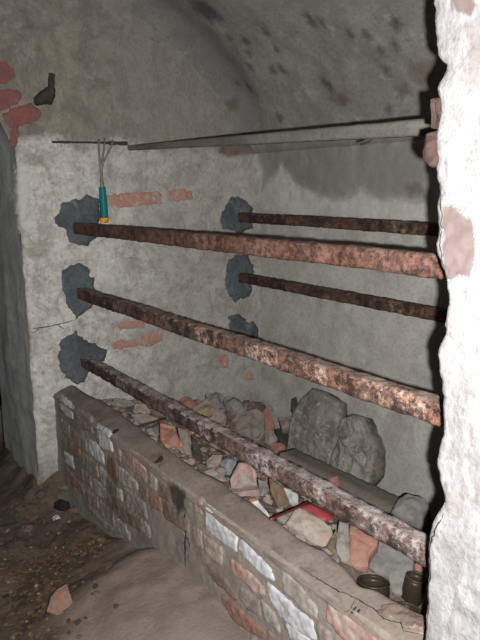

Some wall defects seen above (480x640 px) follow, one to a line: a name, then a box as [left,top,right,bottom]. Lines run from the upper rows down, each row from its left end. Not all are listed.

corrosion [73,222,447,280]
corrosion [238,212,439,237]
corrosion [239,273,448,323]
corrosion [77,288,444,428]
corrosion [80,356,430,569]
crack [183,508,191,566]